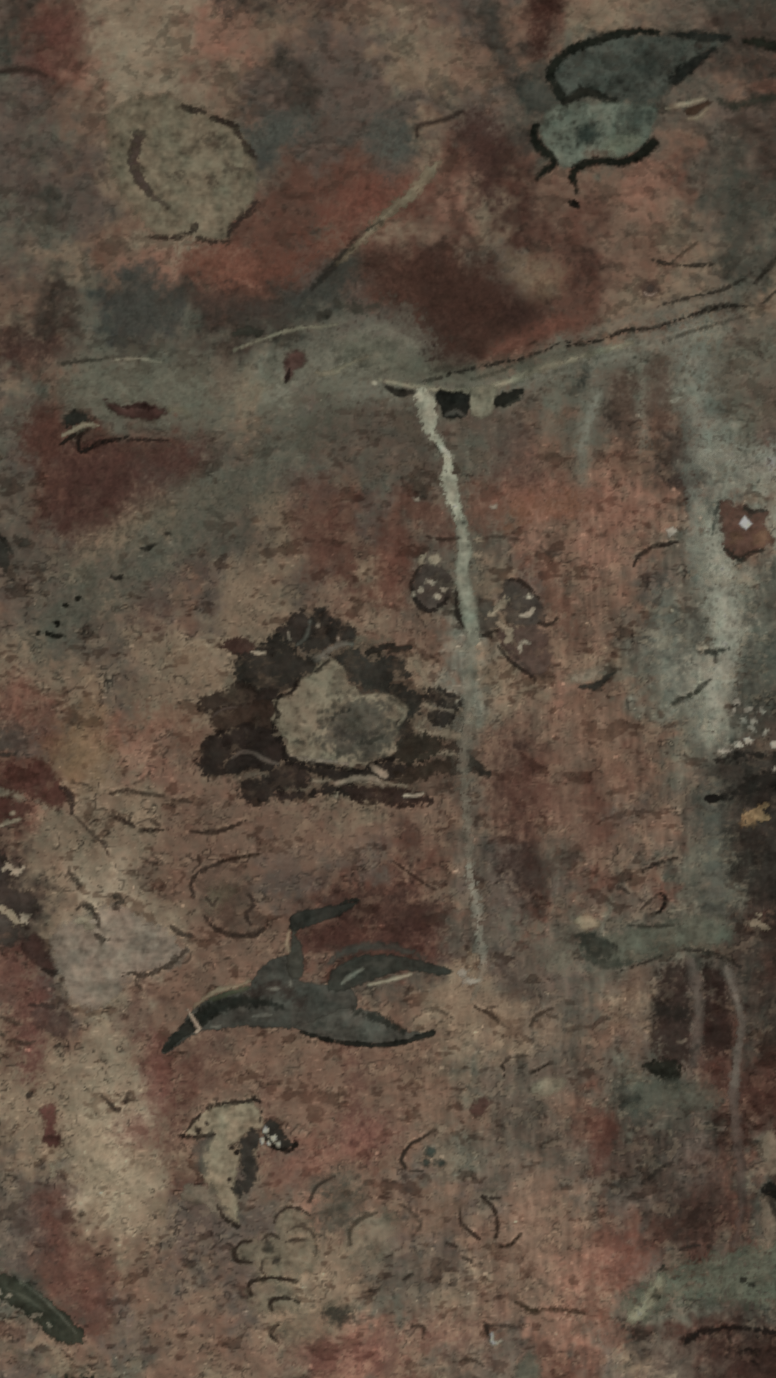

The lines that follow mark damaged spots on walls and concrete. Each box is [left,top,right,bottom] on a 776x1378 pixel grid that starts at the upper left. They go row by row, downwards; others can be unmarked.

spalling [385,386,414,397]
spalling [436,390,470,418]
spalling [494,389,524,407]
damp [413,387,487,997]